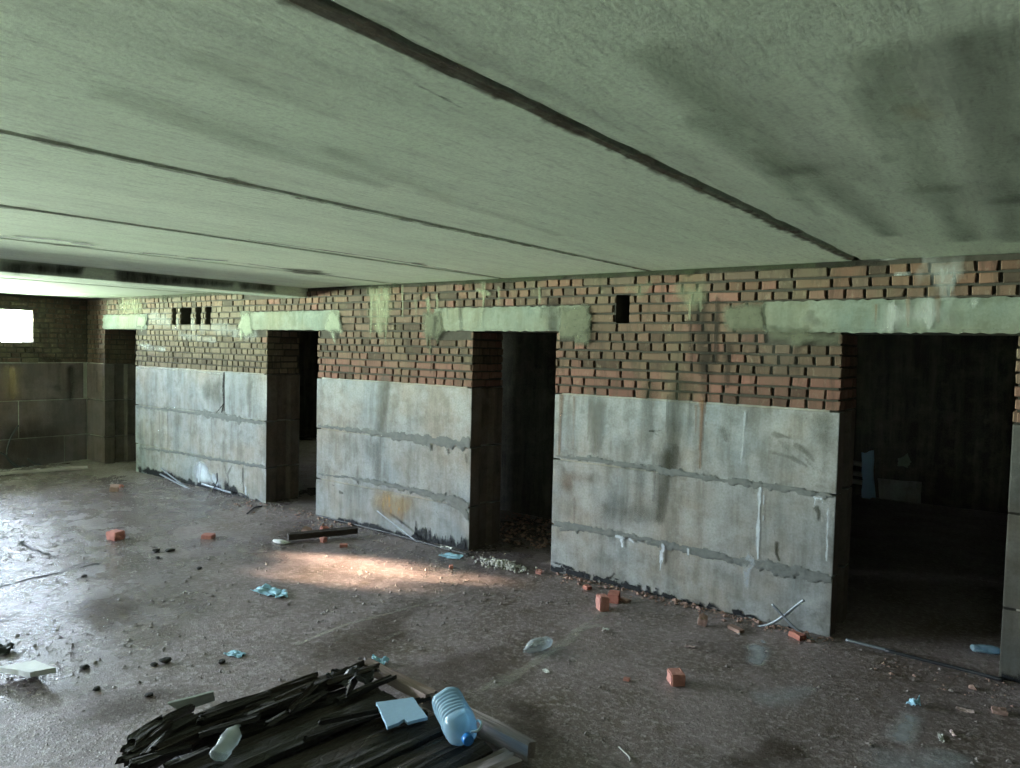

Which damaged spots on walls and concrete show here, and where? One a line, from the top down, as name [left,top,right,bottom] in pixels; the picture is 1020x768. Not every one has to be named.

leakage [756,487,764,559]